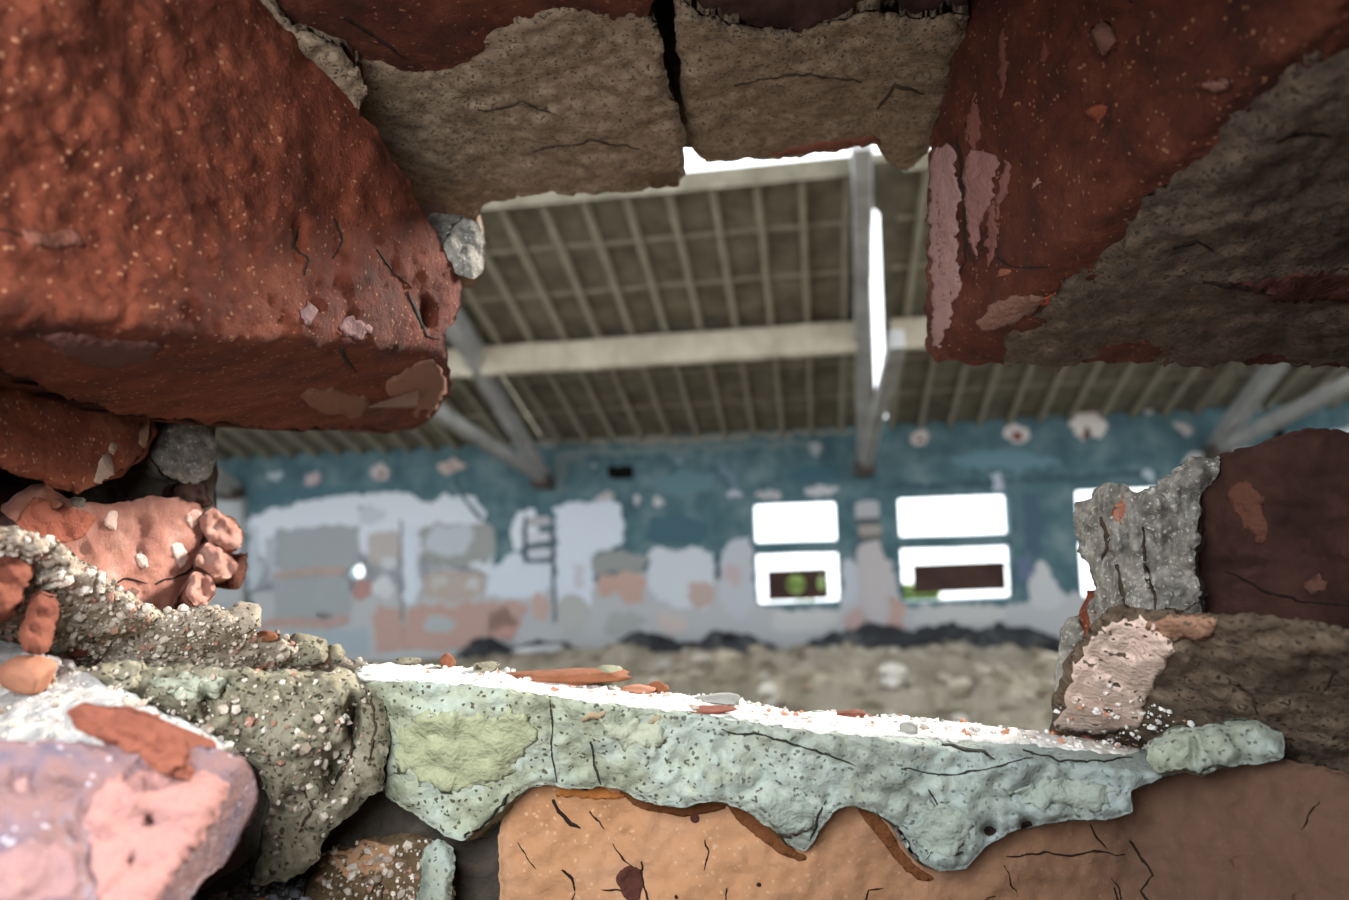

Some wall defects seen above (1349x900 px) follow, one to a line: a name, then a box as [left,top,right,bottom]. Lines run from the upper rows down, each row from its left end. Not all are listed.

spalling [0,0,1097,662]
spalling [1069,413,1108,441]
spalling [1142,468,1154,482]
spalling [1112,496,1125,524]
crack [809,800,827,841]